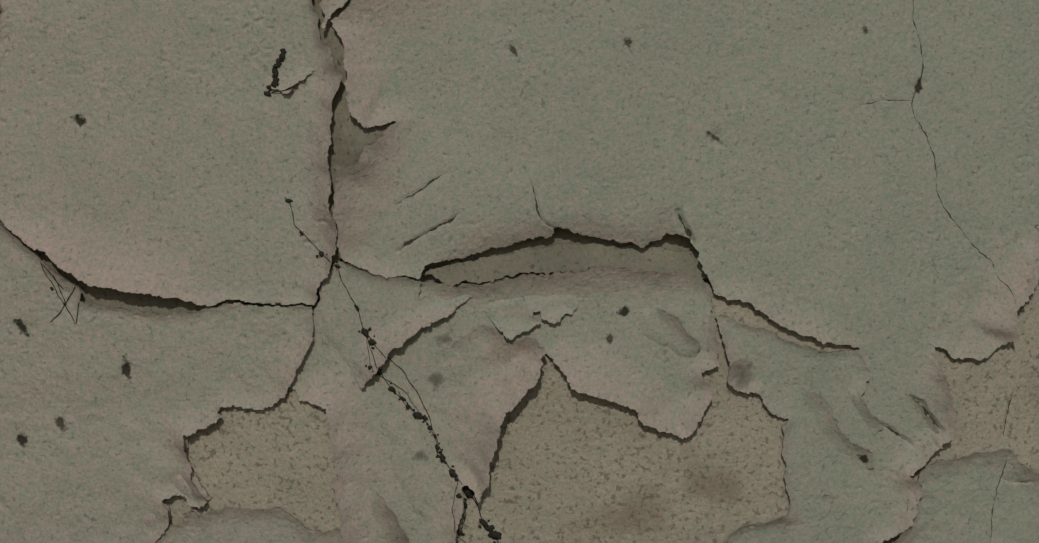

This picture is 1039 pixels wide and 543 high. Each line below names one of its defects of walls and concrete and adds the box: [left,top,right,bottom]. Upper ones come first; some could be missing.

peeling [318,0,351,28]
crack [859,0,1015,299]
crack [0,220,304,315]
peeling [143,374,342,543]
peeling [369,489,409,543]
peeling [322,263,472,388]
spalling [400,215,457,250]
peeling [386,295,790,543]
peeling [799,365,875,470]
peeling [897,224,1039,496]